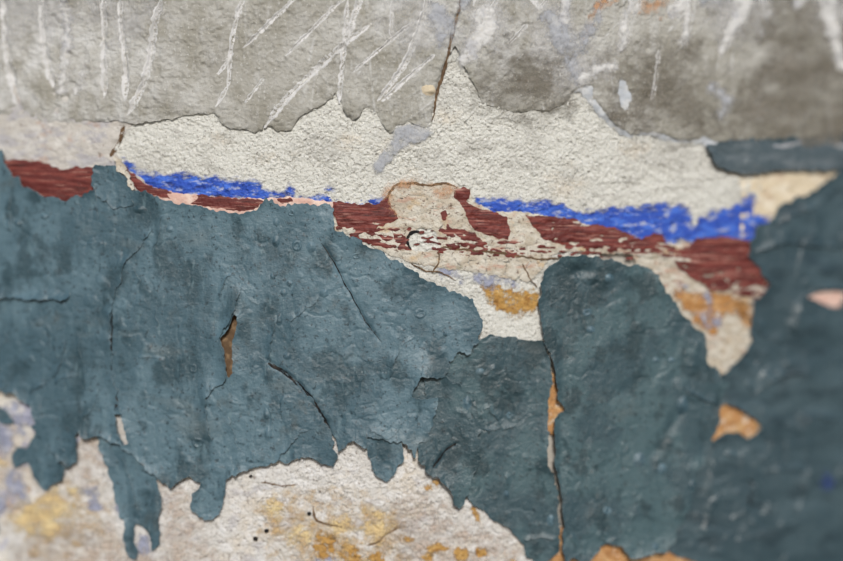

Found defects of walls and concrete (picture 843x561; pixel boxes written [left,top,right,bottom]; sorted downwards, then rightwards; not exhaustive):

crack [431,0,461,122]
spalling [92,46,843,237]
spalling [808,291,843,307]
crack [268,360,330,428]
peeling [0,225,770,561]